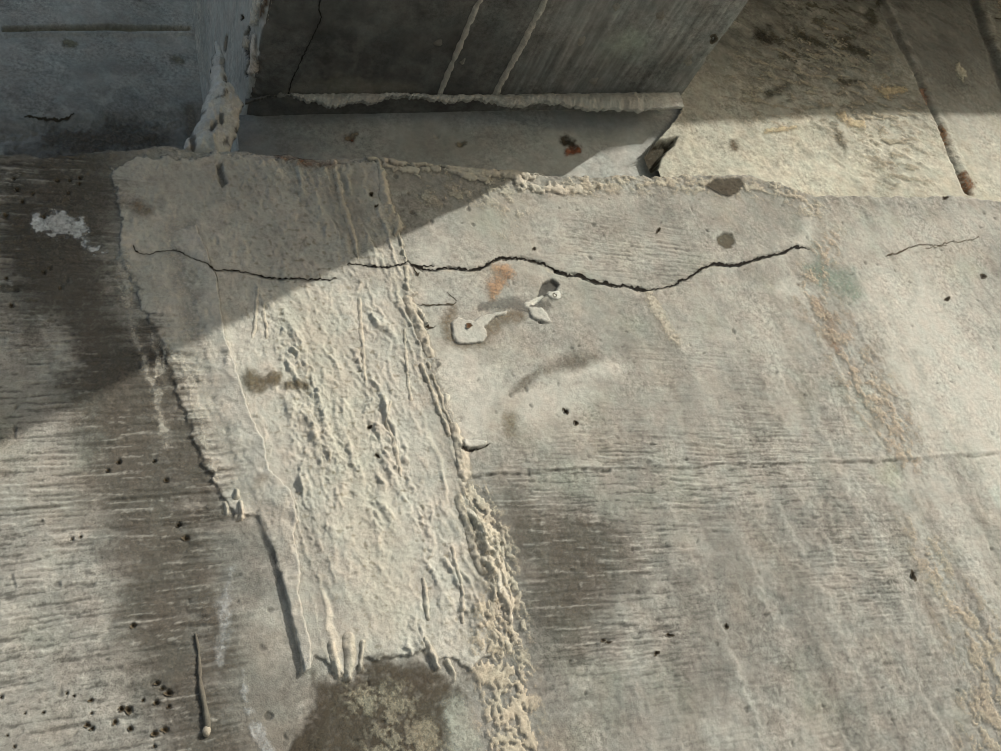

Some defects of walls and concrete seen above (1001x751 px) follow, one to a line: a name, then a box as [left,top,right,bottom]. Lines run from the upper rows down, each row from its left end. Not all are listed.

crack [288,0,322,94]
crack [133,245,810,329]
peeling [443,281,561,346]
crack [887,236,979,256]
damp [0,119,622,751]